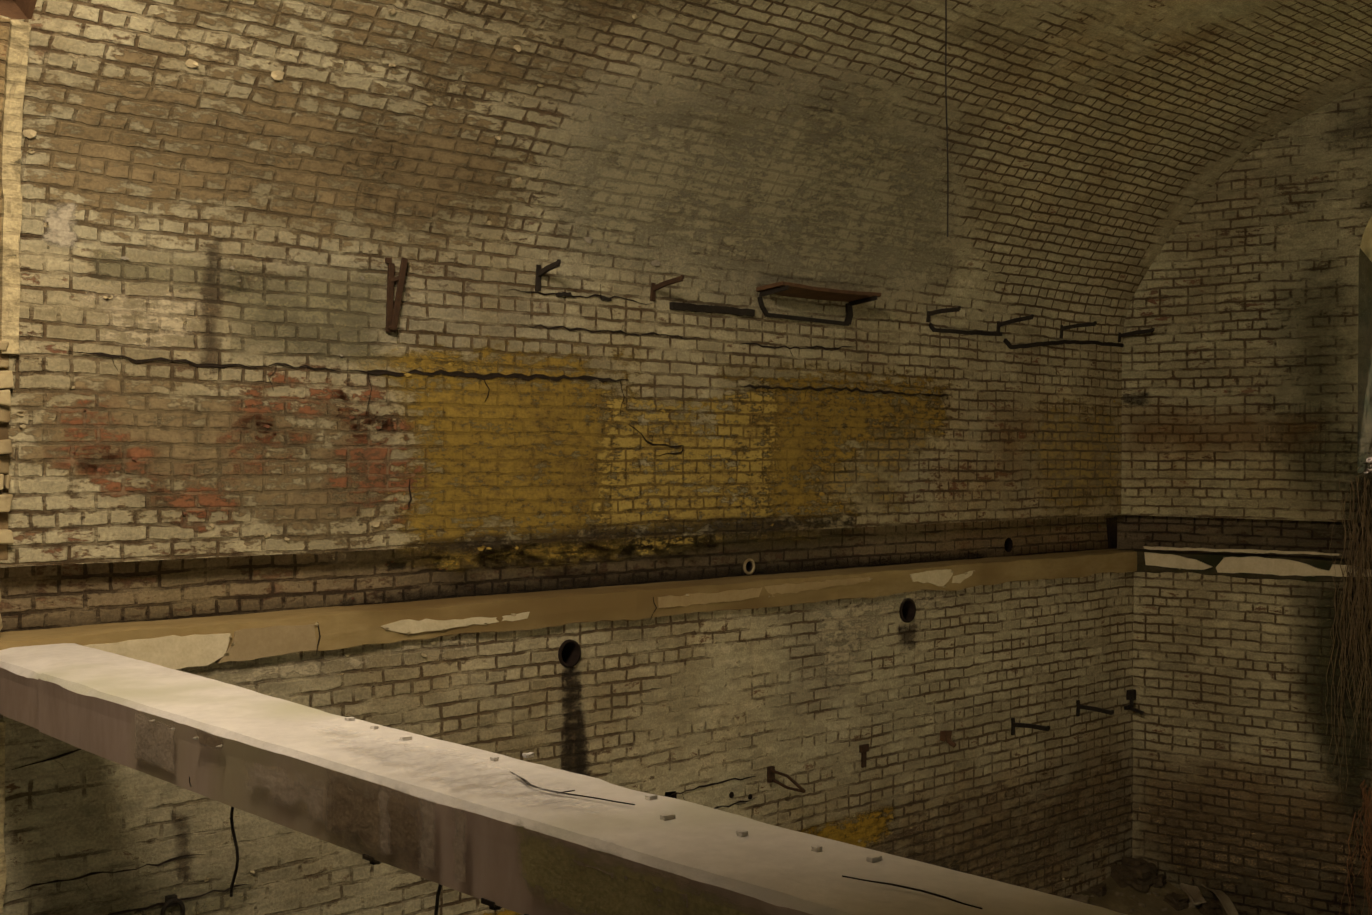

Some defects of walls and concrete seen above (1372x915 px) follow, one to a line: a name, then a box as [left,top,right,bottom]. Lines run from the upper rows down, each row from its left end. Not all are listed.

crack [509,284,700,339]
crack [76,352,683,456]
flaking render [1143,546,1372,577]
flaking render [84,622,319,670]
flaking render [381,612,530,657]
water stain [564,668,586,775]